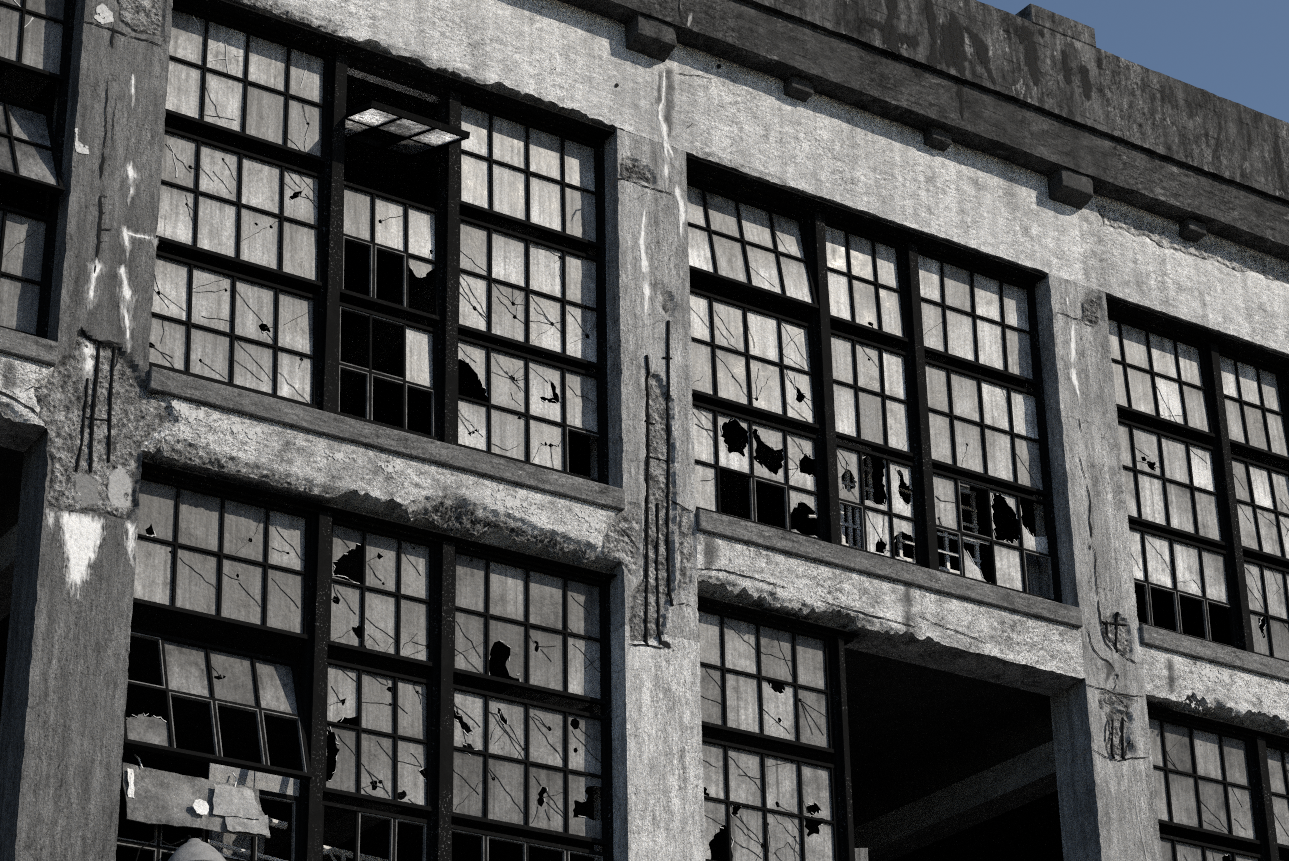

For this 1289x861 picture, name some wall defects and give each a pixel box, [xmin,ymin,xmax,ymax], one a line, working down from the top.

damp [861,0,996,118]
damp [1019,26,1046,86]
damp [1062,50,1103,101]
spalling [0,336,343,518]
peeling [323,448,357,463]
peeling [373,460,407,480]
spalling [409,297,694,647]
spalling [1102,612,1129,656]
peeling [1196,662,1228,685]
spalling [1100,692,1134,761]